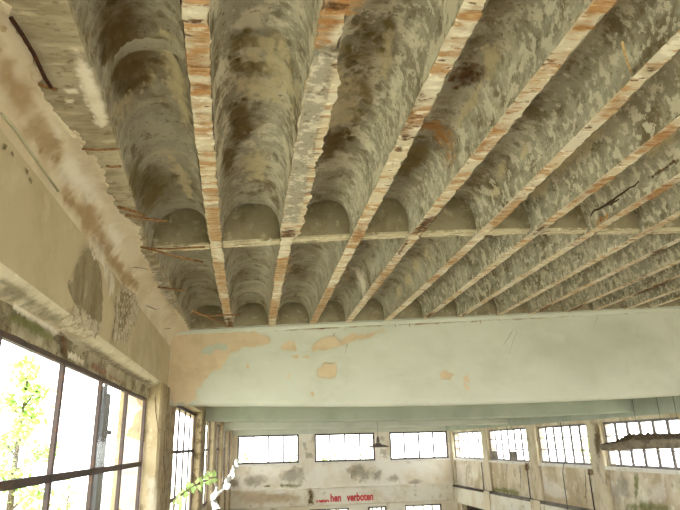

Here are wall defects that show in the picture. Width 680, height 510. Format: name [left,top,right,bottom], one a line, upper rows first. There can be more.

water stain [0,11,139,300]
water stain [221,24,304,183]
water stain [316,16,397,163]
corrosion [395,92,457,173]
corrosion [439,29,486,91]
spalling [0,0,271,407]
crack [590,180,639,217]
corrosion [204,261,234,329]
peeling [280,329,386,359]
water stain [231,465,316,509]
water stain [348,463,399,484]